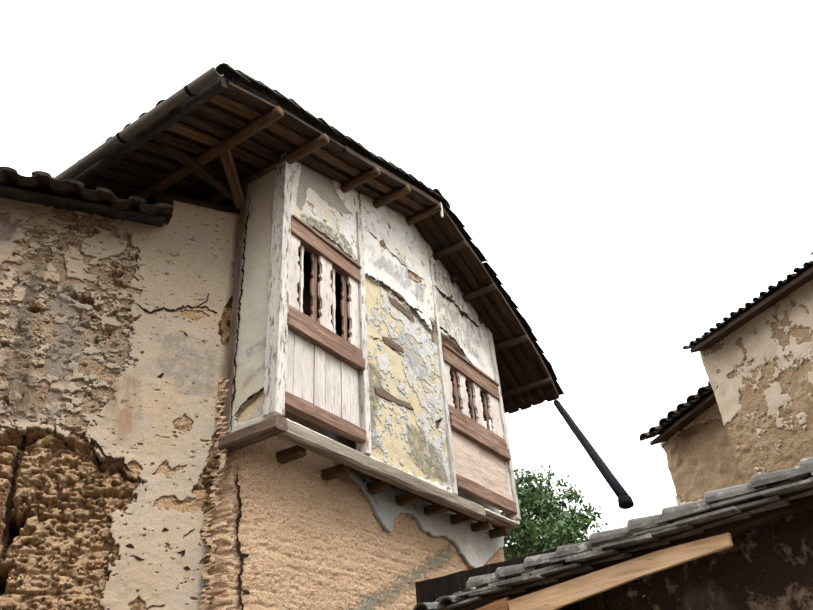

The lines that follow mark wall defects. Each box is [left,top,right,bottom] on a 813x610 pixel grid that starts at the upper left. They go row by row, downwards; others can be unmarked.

peeling [293,163,351,216]
spalling [0,205,220,610]
crack [135,293,227,318]
spalling [216,297,233,347]
peeling [365,276,461,491]
spalling [663,294,813,502]
crack [0,436,25,559]
crack [235,466,250,610]